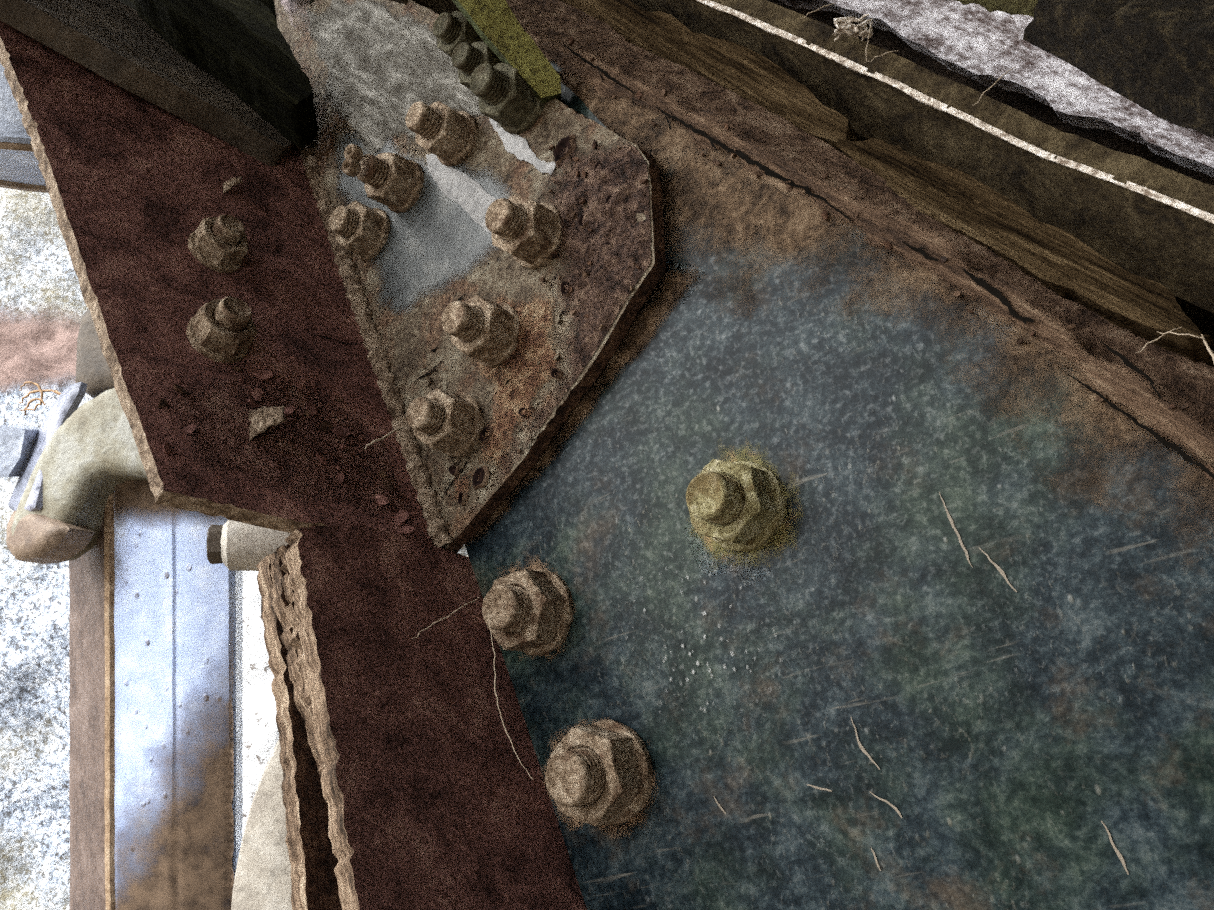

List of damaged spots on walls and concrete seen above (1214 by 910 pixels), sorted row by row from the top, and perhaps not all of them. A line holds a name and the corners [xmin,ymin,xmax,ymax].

rust [457,23,1214,553]
rust [510,562,547,573]